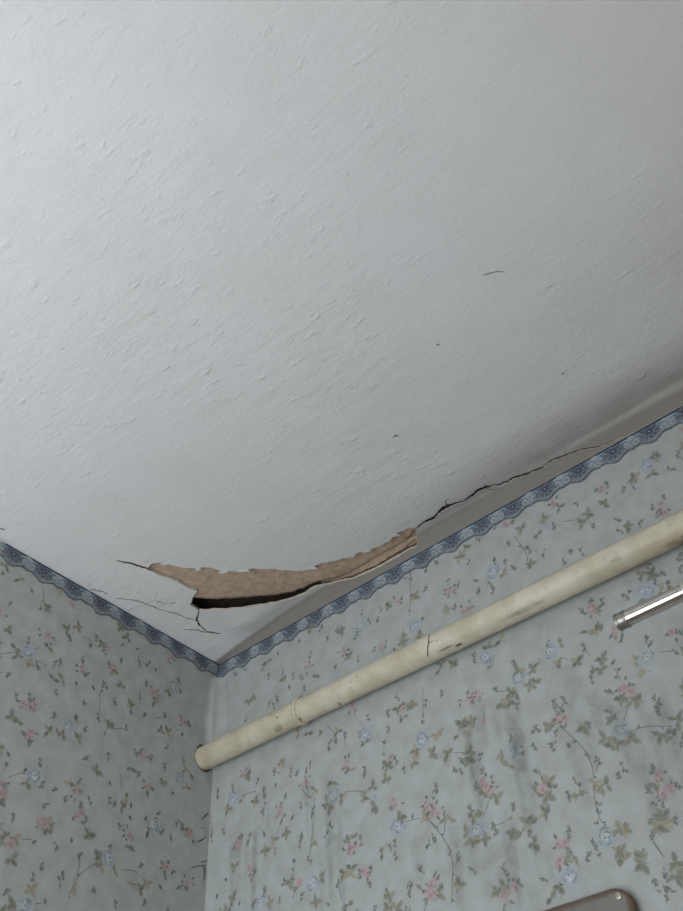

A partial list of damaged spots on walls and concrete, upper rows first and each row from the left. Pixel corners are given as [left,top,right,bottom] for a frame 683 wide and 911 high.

crack [416,439,616,528]
spalling [116,528,418,609]
crack [91,589,220,634]